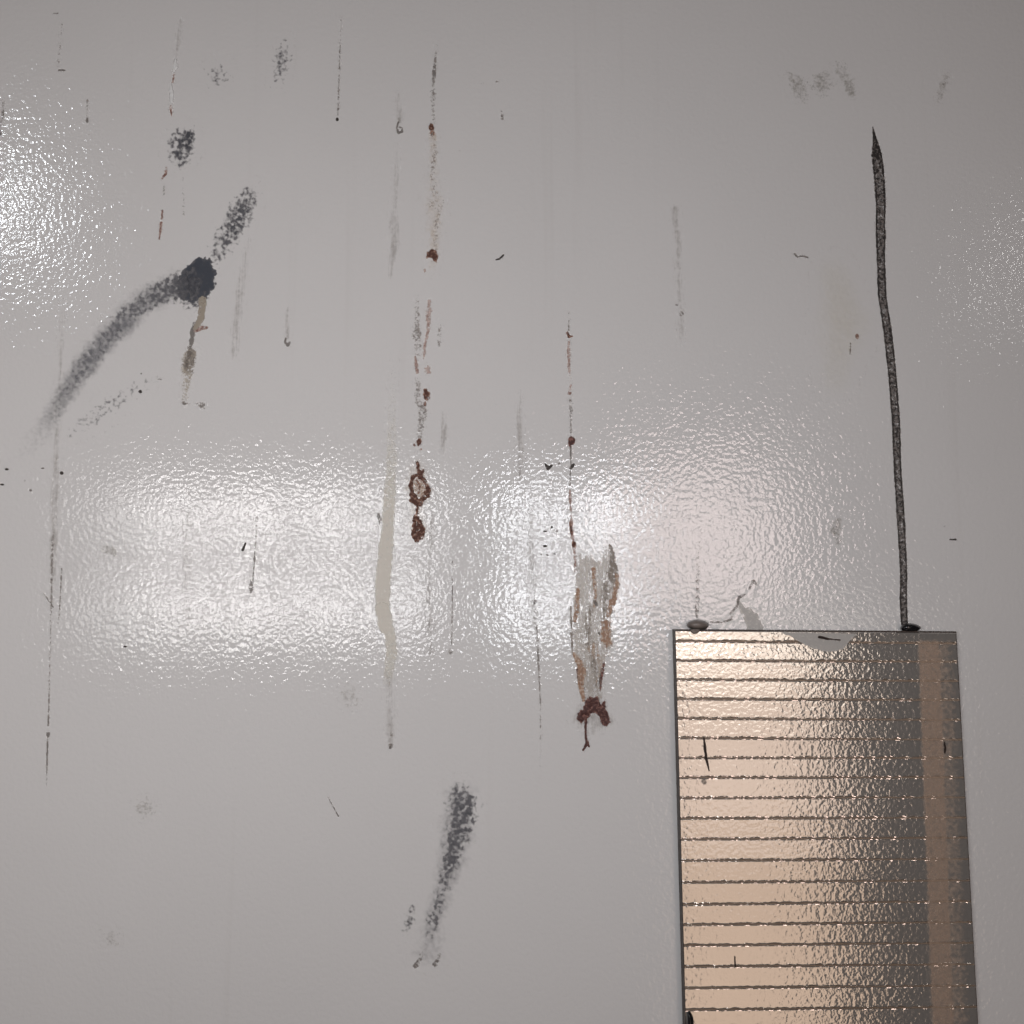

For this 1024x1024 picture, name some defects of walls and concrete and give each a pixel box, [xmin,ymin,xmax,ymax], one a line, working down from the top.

damp [182,296,208,405]
corrosion [408,300,440,542]
corrosion [424,249,438,272]
corrosion [566,313,576,567]
damp [375,448,397,677]
peeling [570,544,619,751]